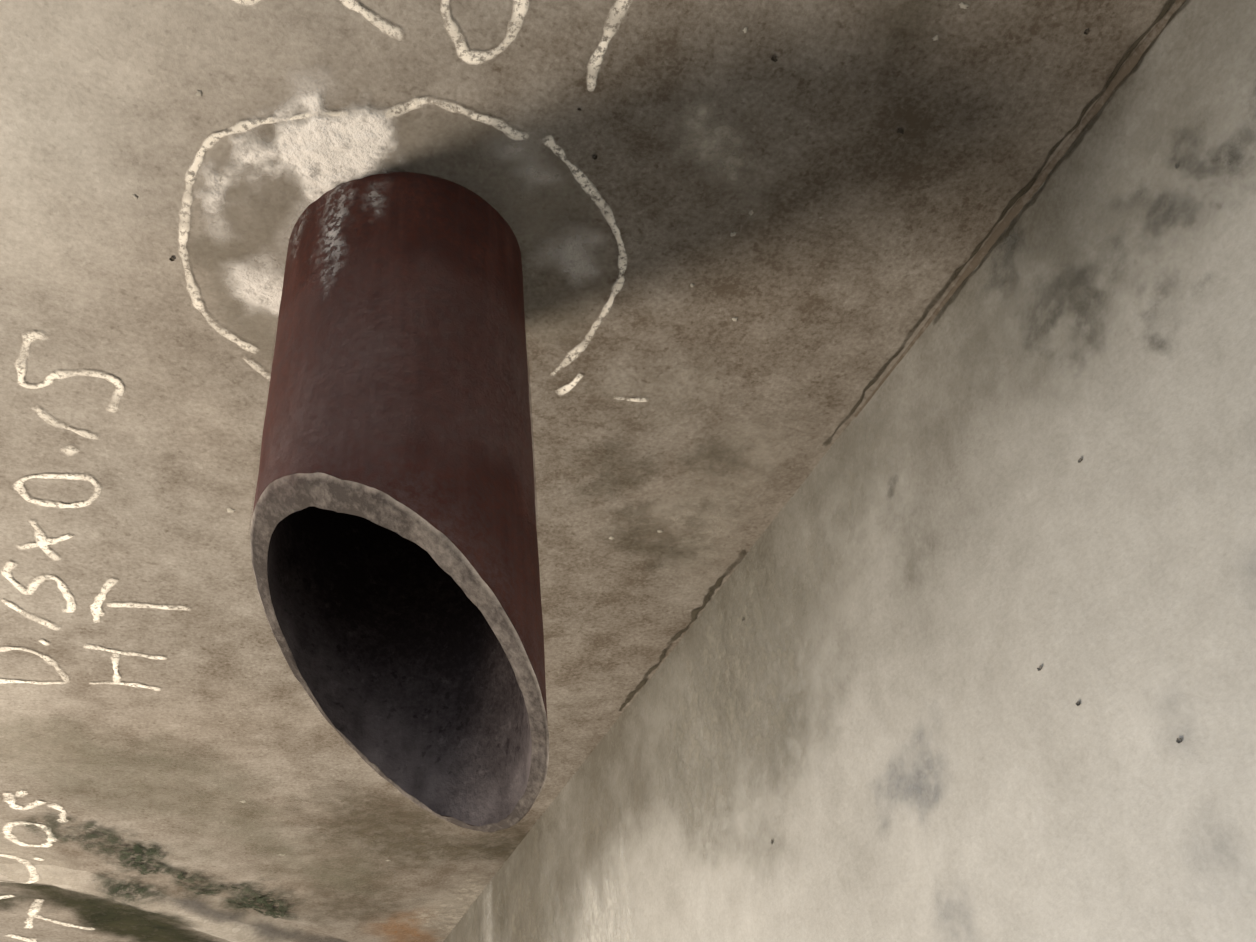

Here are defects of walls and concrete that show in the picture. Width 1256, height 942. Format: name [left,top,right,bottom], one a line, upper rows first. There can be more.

water stain [204,92,394,251]
water stain [210,238,284,344]
water stain [0,846,294,942]
water stain [330,781,619,942]